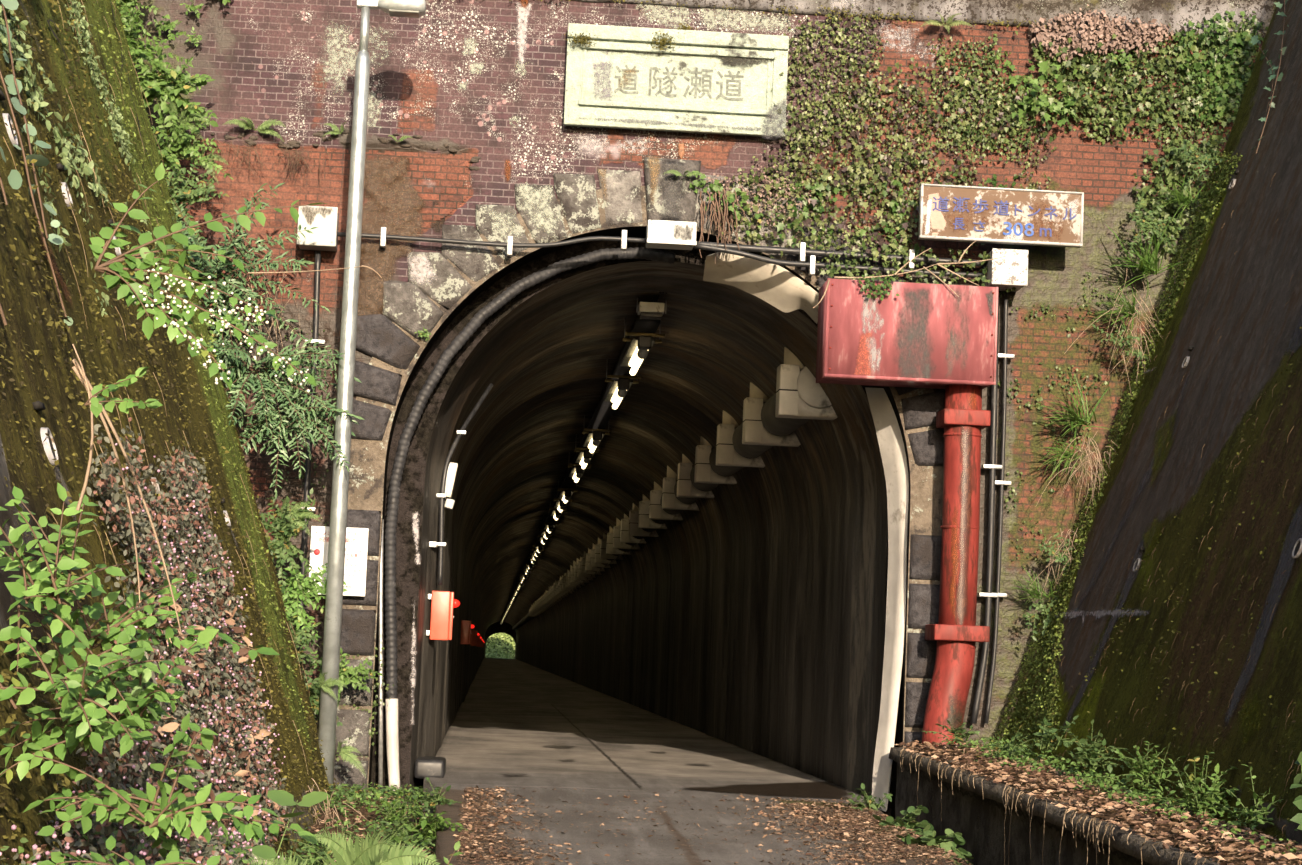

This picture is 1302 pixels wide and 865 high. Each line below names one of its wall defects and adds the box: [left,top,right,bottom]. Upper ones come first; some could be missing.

rust [856,333,871,375]
rust [950,431,972,625]